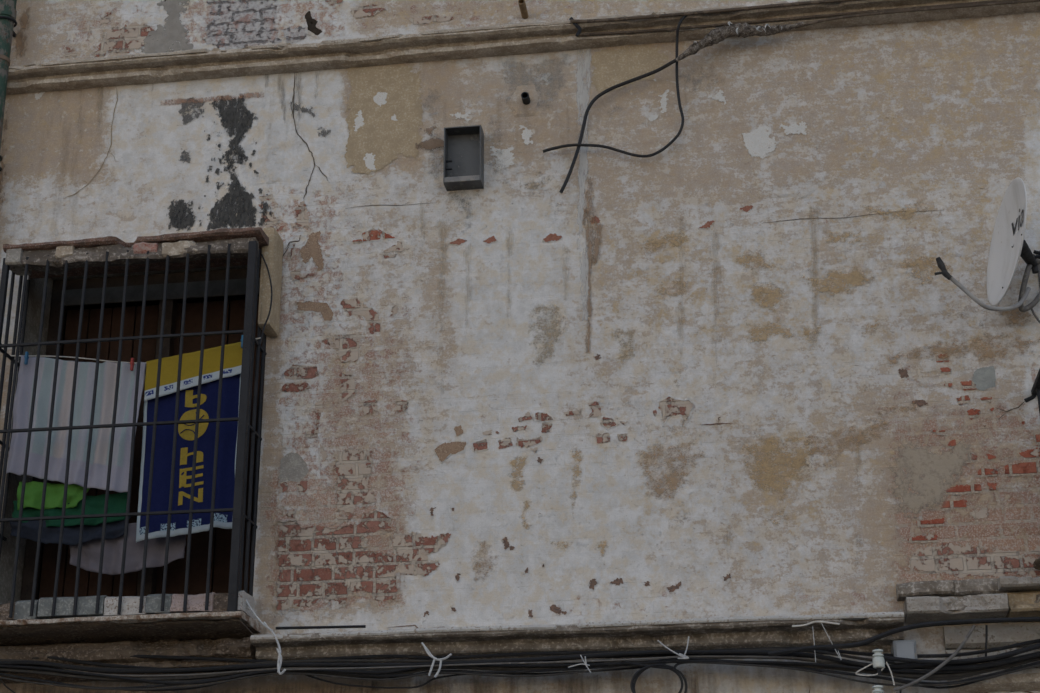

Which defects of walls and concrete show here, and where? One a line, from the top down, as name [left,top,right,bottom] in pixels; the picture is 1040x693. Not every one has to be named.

spalling [85,11,154,57]
spalling [202,0,326,49]
crack [65,88,118,198]
crack [291,72,329,199]
spalling [352,227,407,258]
spalling [280,363,321,392]
spalling [294,297,399,416]
spalling [433,401,628,466]
spalling [653,395,695,427]
spalling [935,353,994,427]
spalling [270,399,451,615]
spalling [903,434,1040,580]